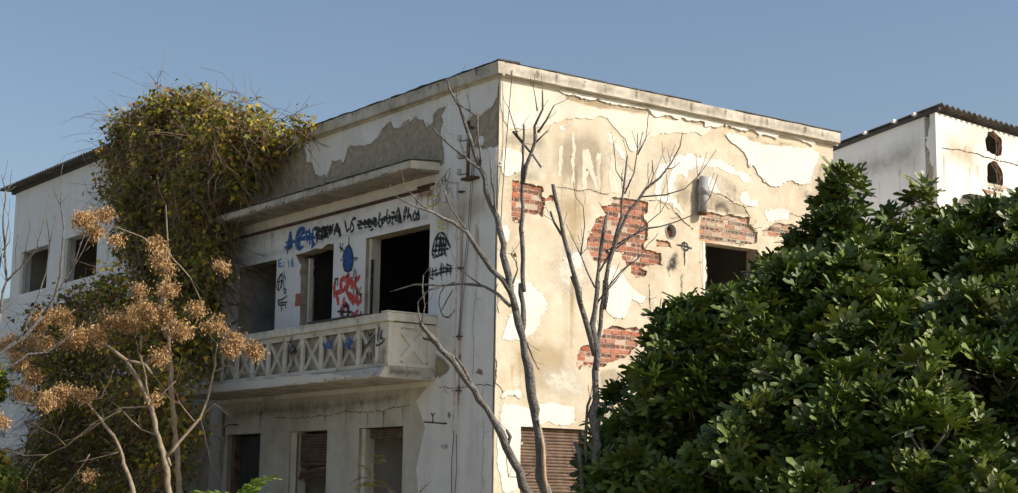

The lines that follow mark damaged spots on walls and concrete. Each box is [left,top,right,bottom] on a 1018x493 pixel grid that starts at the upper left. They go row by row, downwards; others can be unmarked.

peeling [229,103,448,212]
flaking render [466,99,554,242]
crack [941,147,1018,166]
flaking render [496,125,819,493]